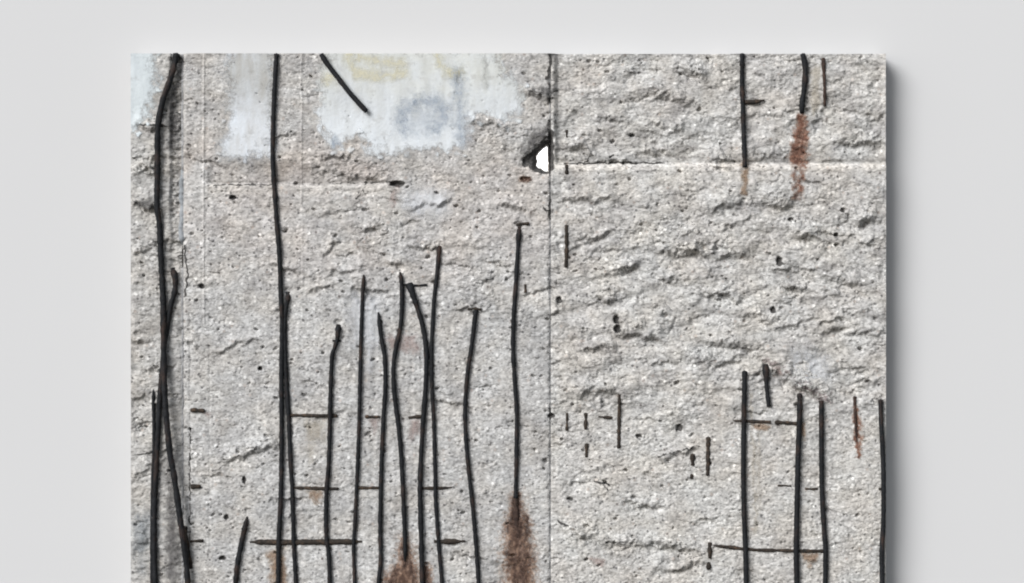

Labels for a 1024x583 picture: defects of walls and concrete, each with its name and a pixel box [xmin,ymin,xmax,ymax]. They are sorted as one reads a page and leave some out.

peeling [305,53,597,188]
rust [789,114,810,199]
rust [852,407,864,458]
rust [376,537,433,583]
rust [497,492,541,583]